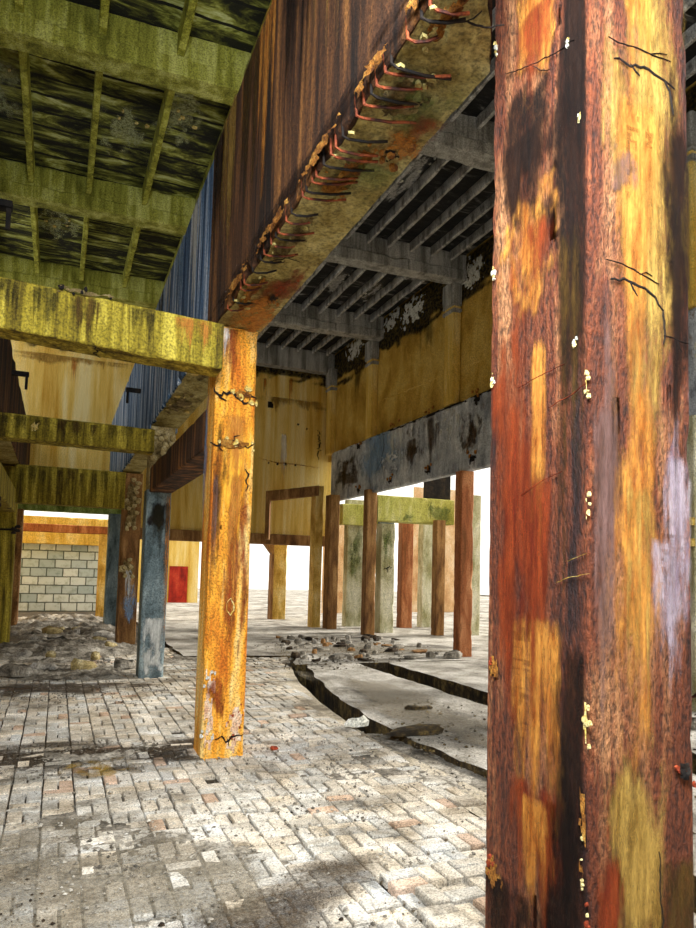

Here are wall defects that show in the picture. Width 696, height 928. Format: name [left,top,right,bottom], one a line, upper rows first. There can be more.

crack [214,387,257,405]
water stain [212,66,369,312]
spalling [225,40,452,312]
water stain [335,282,448,385]
water stain [462,236,494,303]
crack [608,36,675,115]
corrosion [603,0,682,731]
crack [606,259,689,352]
water stain [686,83,696,113]
corrosion [221,402,252,634]
corrosion [493,330,559,894]
corrosion [598,764,661,928]